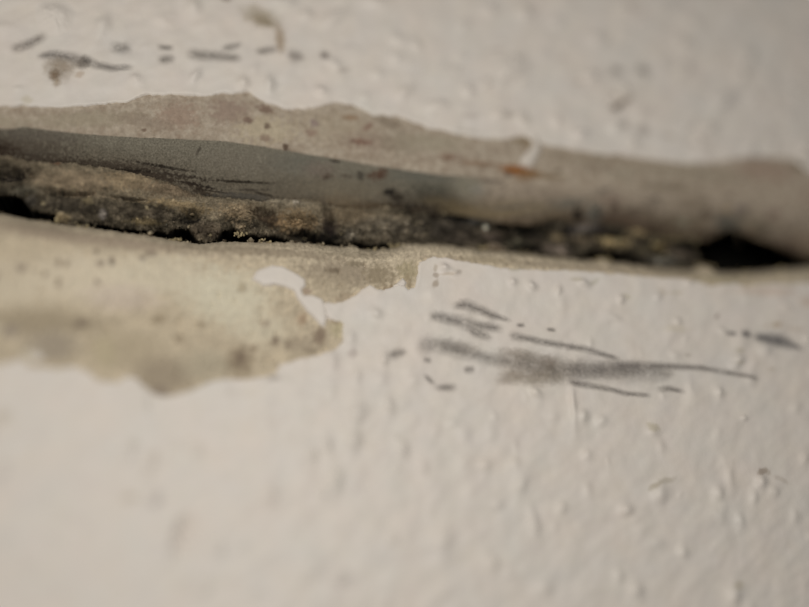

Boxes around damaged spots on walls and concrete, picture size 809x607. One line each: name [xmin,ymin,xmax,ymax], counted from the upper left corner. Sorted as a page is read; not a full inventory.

spalling [0,92,809,208]
crack [0,127,809,273]
spalling [0,214,809,396]